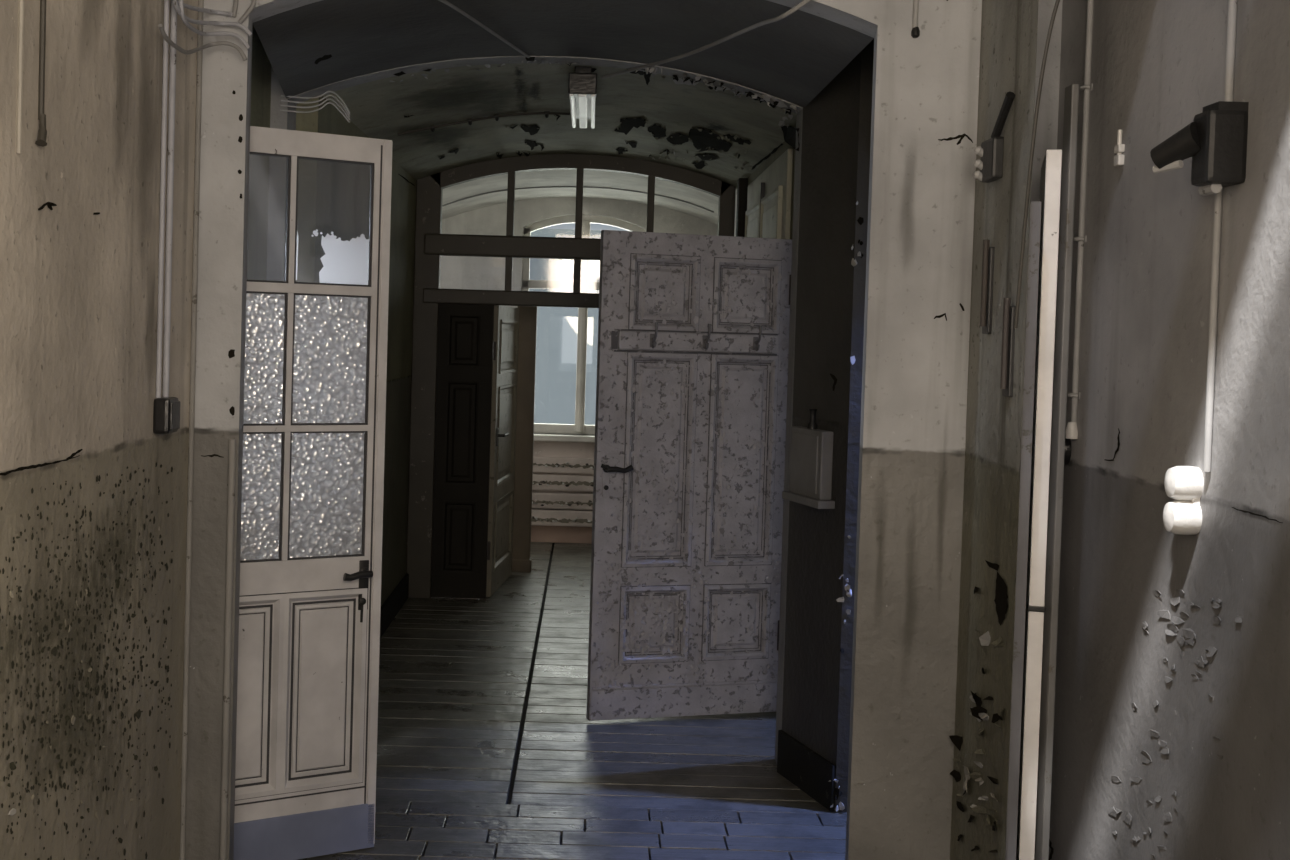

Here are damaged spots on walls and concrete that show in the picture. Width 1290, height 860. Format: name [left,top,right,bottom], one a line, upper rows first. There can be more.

flaking render [613,116,752,172]
flaking render [630,67,800,151]
flaking render [974,560,1008,647]
damp [0,462,173,860]
peeling [949,691,1005,853]